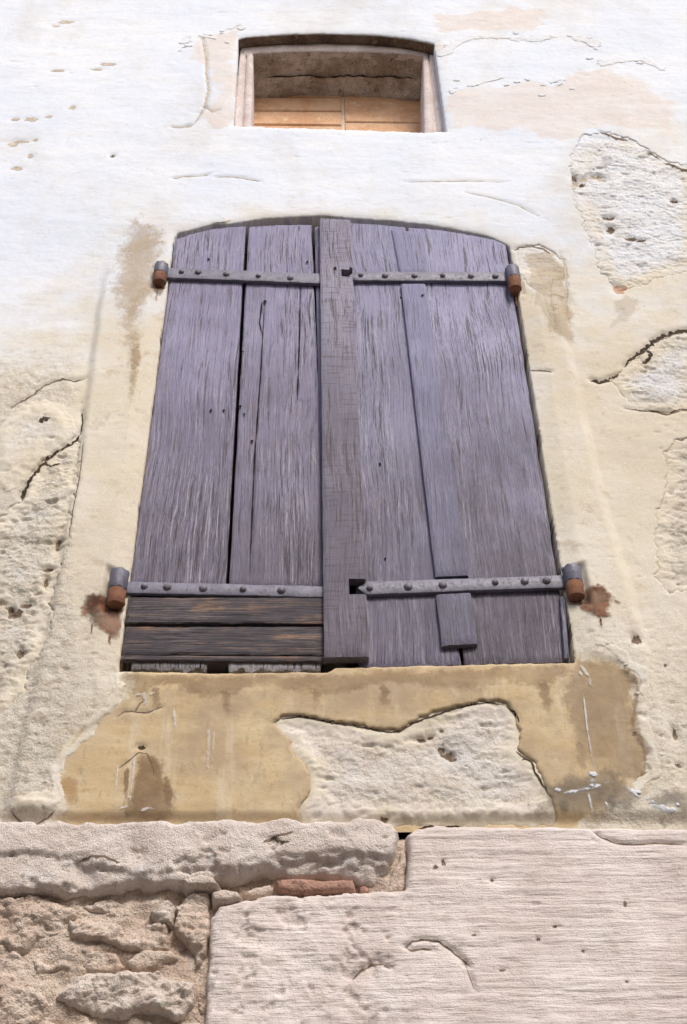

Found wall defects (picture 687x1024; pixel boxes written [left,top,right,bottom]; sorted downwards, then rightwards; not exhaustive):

spalling [568,132,687,294]
crack [591,329,687,384]
spalling [609,333,687,414]
crack [23,413,84,534]
spalling [0,435,81,714]
rust [82,594,122,643]
rust [580,584,620,625]
spalling [275,701,609,833]